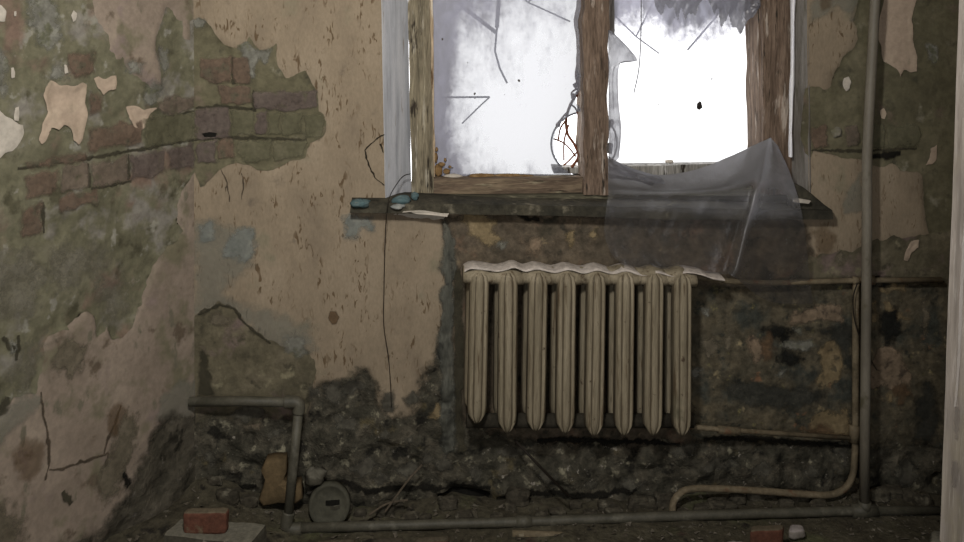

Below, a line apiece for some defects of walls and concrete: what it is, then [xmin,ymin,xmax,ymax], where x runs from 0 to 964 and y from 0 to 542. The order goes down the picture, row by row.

flaking render [0,0,326,406]
flaking render [775,0,959,287]
crack [40,392,122,481]
flaking render [194,301,316,427]
water stain [80,214,964,542]